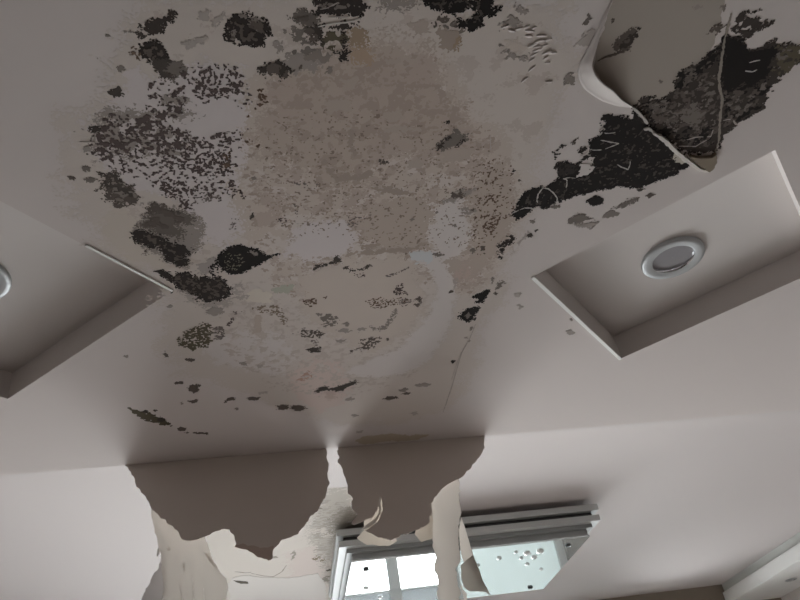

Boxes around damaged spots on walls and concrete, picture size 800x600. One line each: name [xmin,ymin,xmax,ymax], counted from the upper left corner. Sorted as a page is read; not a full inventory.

peeling [501,25,553,83]
damp [46,0,800,445]
flaking render [576,163,595,178]
flaking render [206,487,363,600]